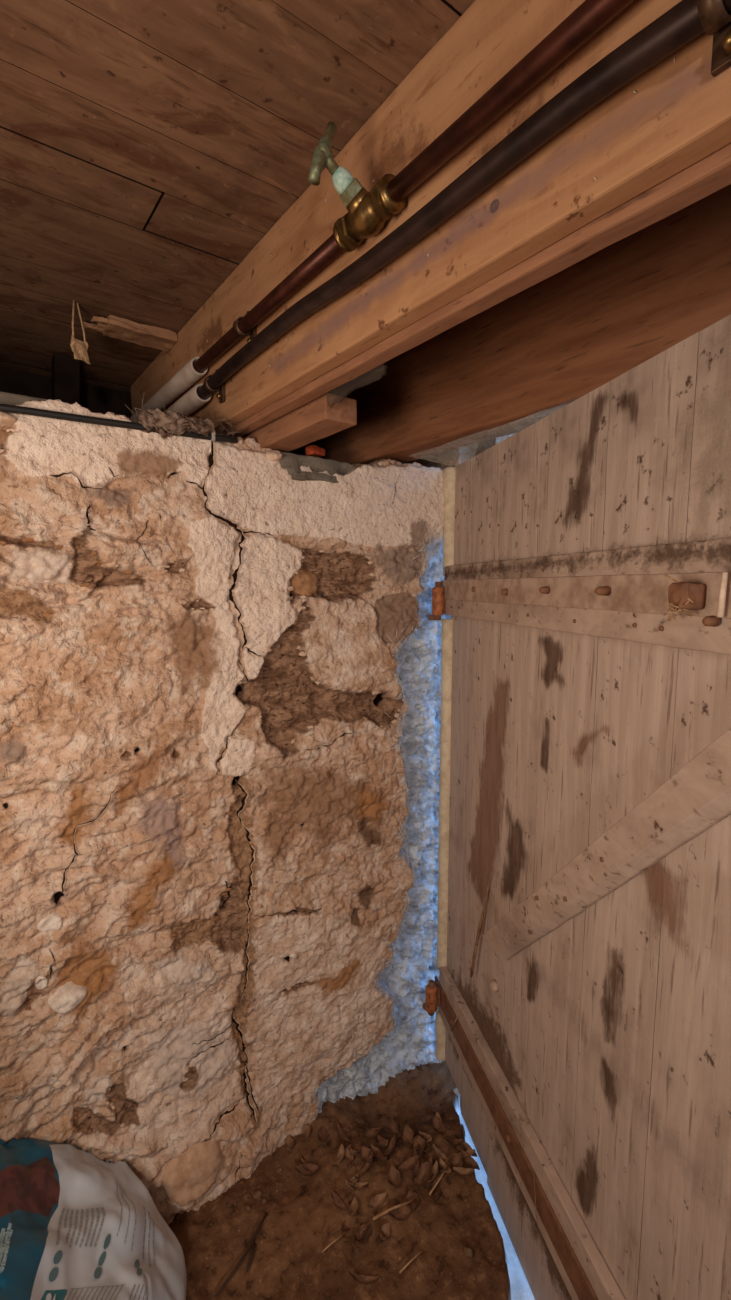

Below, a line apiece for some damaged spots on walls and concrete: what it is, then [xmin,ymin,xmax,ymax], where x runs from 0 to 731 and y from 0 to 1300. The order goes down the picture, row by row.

water stain [621,393,638,420]
water stain [565,395,605,523]
spalling [0,529,145,589]
crack [167,441,273,681]
water stain [375,520,428,583]
spalling [234,549,403,757]
crack [62,786,119,892]
water stain [258,759,389,862]
crack [188,717,320,1140]
water stain [317,959,361,994]
water stain [351,885,374,927]